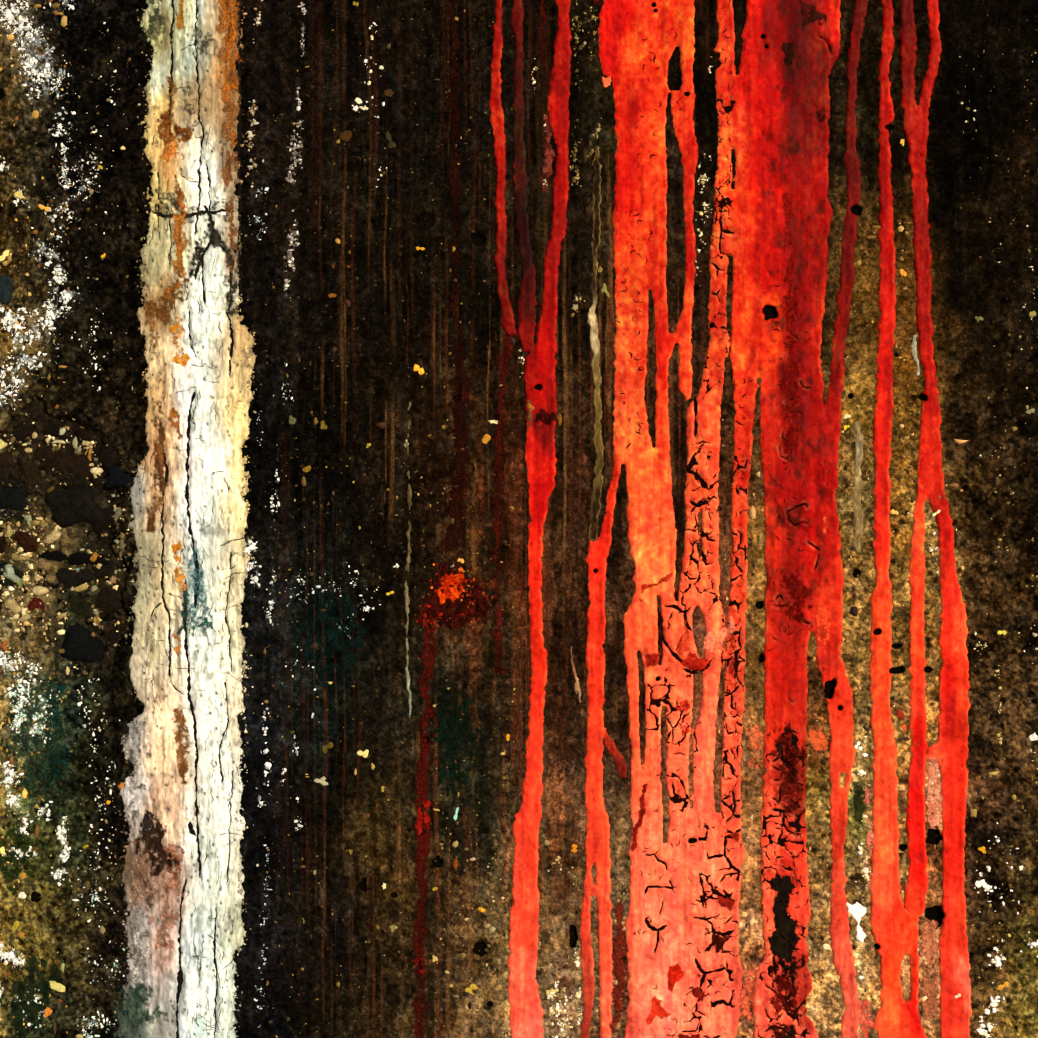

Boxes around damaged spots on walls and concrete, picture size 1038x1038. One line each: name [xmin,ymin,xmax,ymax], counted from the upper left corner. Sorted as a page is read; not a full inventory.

corrosion [176,0,184,29]
corrosion [157,76,192,162]
corrosion [216,0,242,271]
corrosion [143,175,190,367]
corrosion [146,402,182,533]
corrosion [171,541,186,590]
leakage [0,0,381,1038]
crack [137,0,247,1038]
crack [633,0,821,1038]
corrosion [173,709,191,785]